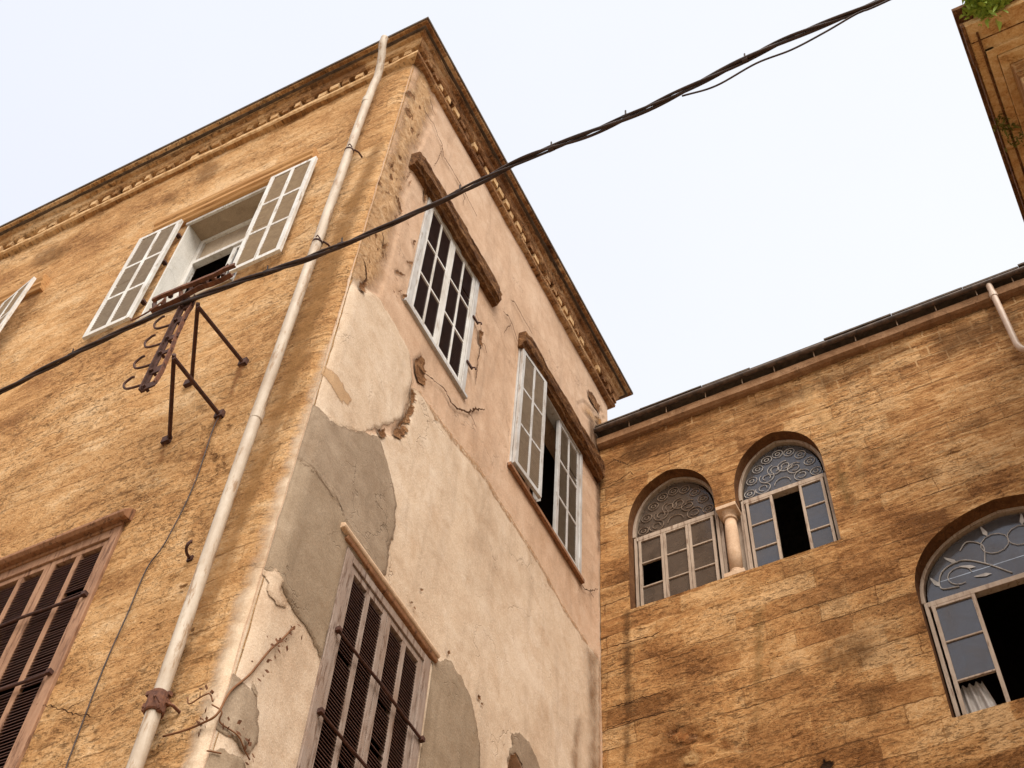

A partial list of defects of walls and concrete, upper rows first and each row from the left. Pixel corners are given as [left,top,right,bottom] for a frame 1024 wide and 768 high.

spalling [378,356,427,439]
crack [417,300,532,426]